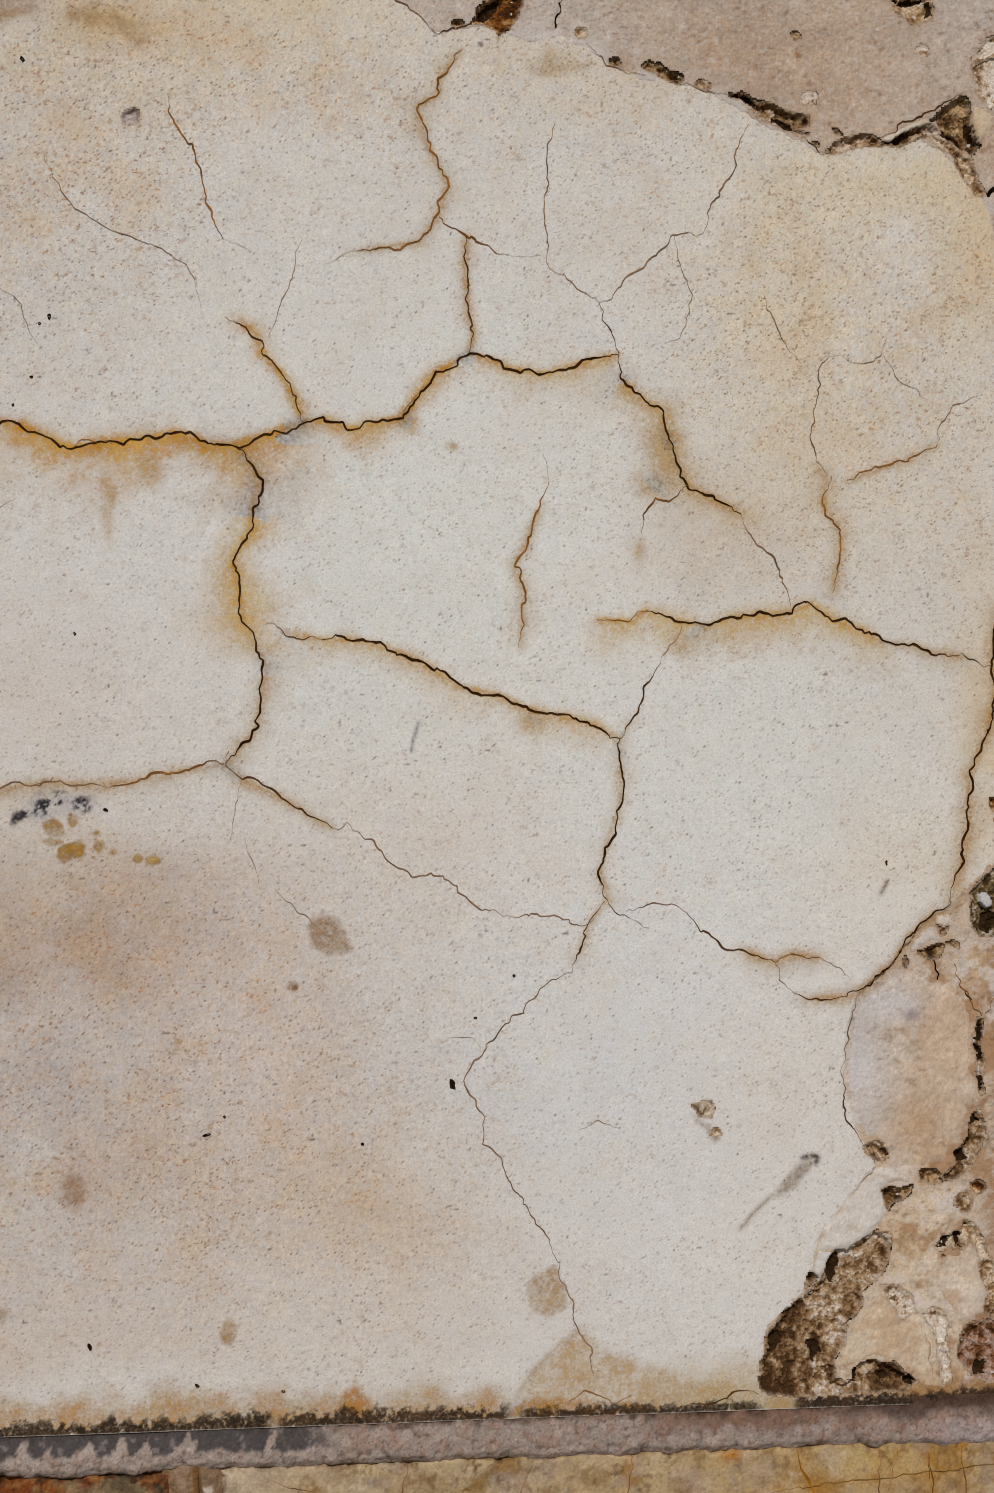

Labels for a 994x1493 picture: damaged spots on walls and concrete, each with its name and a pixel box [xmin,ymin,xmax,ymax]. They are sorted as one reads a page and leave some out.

spalling [451,0,524,36]
spalling [890,0,935,26]
spalling [641,35,994,197]
rust [4,325,456,471]
crack [0,50,994,789]
crack [230,769,512,917]
crack [951,698,994,888]
crack [274,623,688,1248]
crack [693,896,951,1001]
spalling [902,868,994,968]
crack [841,1004,863,1144]
spalling [757,1016,994,1399]